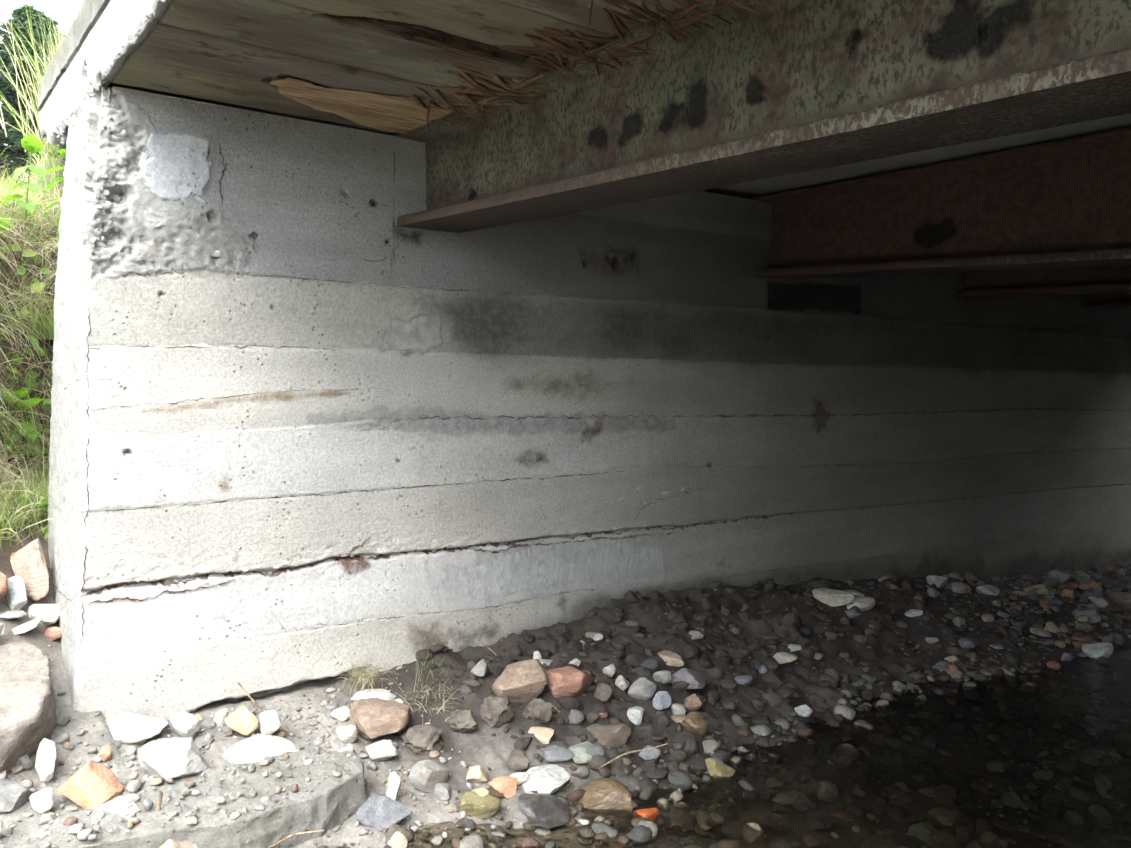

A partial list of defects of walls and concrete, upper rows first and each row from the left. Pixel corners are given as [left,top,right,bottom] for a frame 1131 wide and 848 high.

spalling [41,0,247,279]
crack [52,140,795,655]